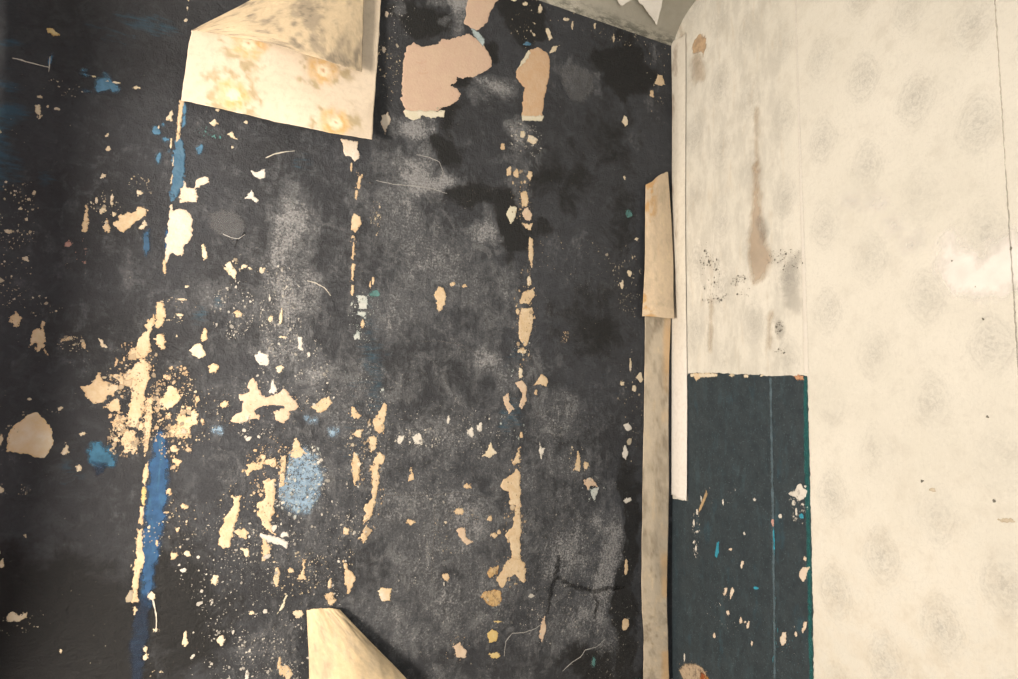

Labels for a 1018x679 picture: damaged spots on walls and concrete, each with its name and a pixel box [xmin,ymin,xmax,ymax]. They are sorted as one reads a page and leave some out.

peeling [378,0,498,120]
peeling [500,0,574,157]
peeling [0,181,86,355]
peeling [65,176,152,264]
peeling [340,139,363,200]
damp [700,187,803,302]
peeling [0,407,70,458]
peeling [81,258,356,679]
peeling [338,203,387,543]
peeling [394,166,571,660]
spalling [771,484,808,550]
peeling [378,580,400,601]